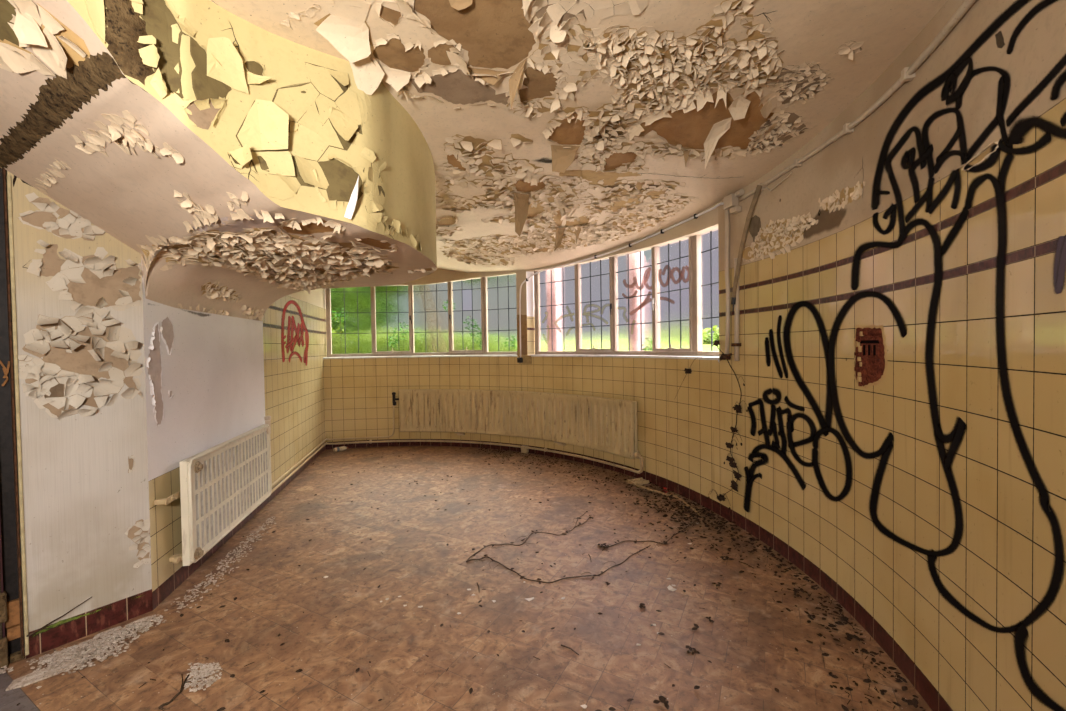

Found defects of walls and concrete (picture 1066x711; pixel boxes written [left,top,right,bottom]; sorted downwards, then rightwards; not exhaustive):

peeling [0,0,835,426]
peeling [742,181,865,262]